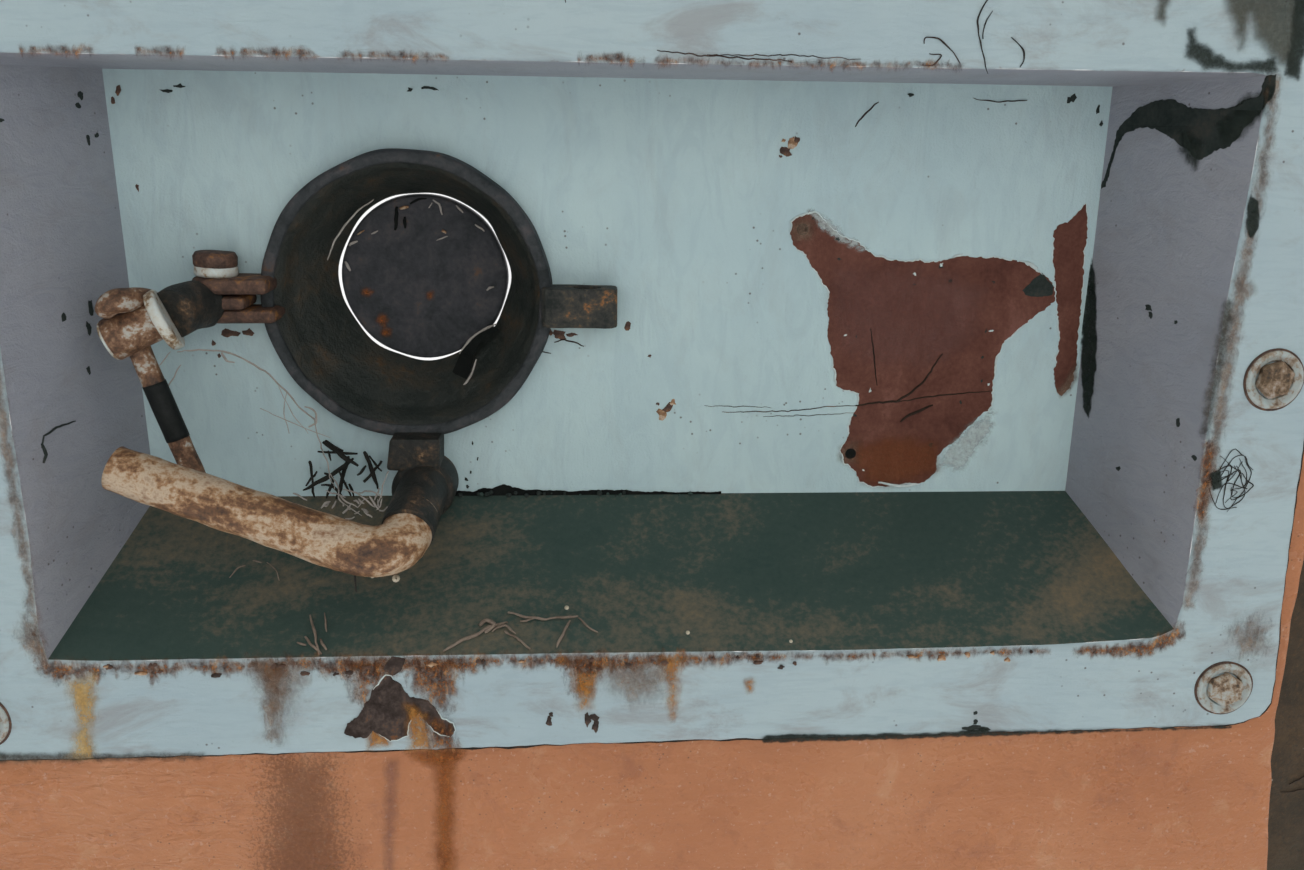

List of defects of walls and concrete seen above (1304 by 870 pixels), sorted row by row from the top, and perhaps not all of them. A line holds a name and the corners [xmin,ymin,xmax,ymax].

peeling [790,203,1089,488]
rust [1186,81,1279,607]
rust [0,375,1045,870]
rust [1077,628,1185,657]